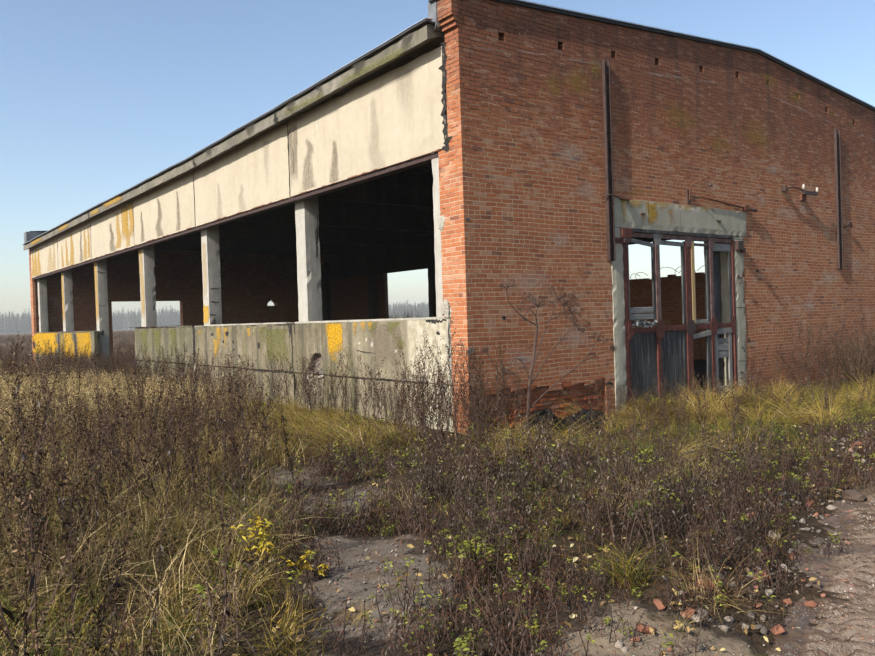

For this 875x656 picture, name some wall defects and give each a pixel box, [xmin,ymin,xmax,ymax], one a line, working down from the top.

spalling [482,378,605,432]